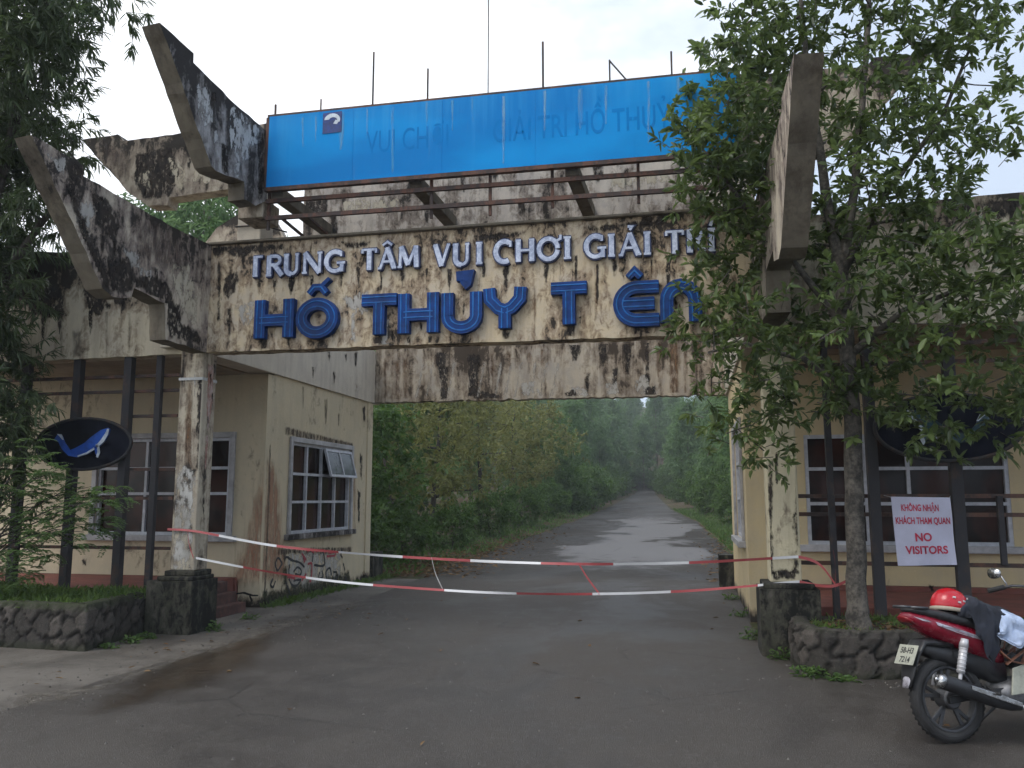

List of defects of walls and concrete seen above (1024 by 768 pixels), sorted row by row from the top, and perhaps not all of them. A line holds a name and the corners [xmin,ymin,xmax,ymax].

leakage [109,141,191,199]
leakage [221,143,229,174]
leakage [65,164,201,356]
leakage [306,200,370,248]
leakage [474,232,521,243]
leakage [420,323,455,399]
leakage [467,354,590,399]
leakage [567,317,581,360]
leakage [598,328,640,390]
leakage [645,343,656,395]
peeling [173,364,214,569]
corrosion [236,468,285,580]